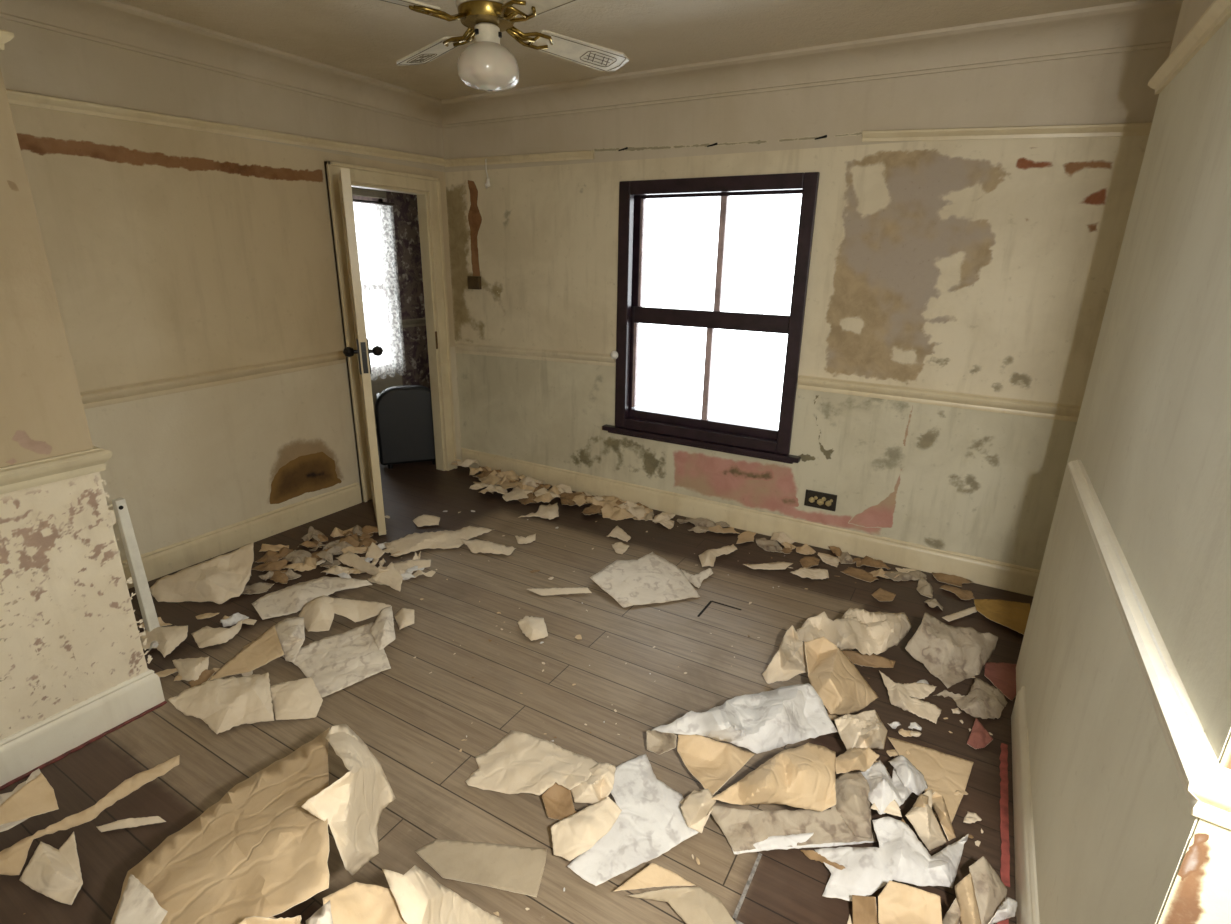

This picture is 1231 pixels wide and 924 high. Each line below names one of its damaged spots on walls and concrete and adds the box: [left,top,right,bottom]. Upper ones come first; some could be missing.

flaking render [16,132,324,184]
peeling [446,174,507,344]
peeling [671,448,903,537]
flaking render [1158,837,1214,924]